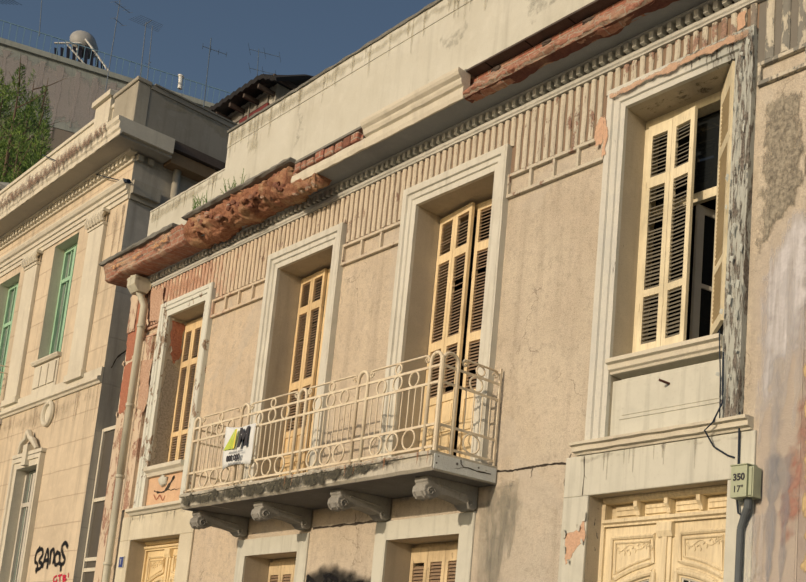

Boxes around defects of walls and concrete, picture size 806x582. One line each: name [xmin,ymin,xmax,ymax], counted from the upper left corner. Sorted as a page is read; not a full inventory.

flaking render [756,93,804,246]
peeling [719,223,743,319]
flaking render [116,284,164,417]
flaking render [152,317,189,464]
crack [455,454,587,495]